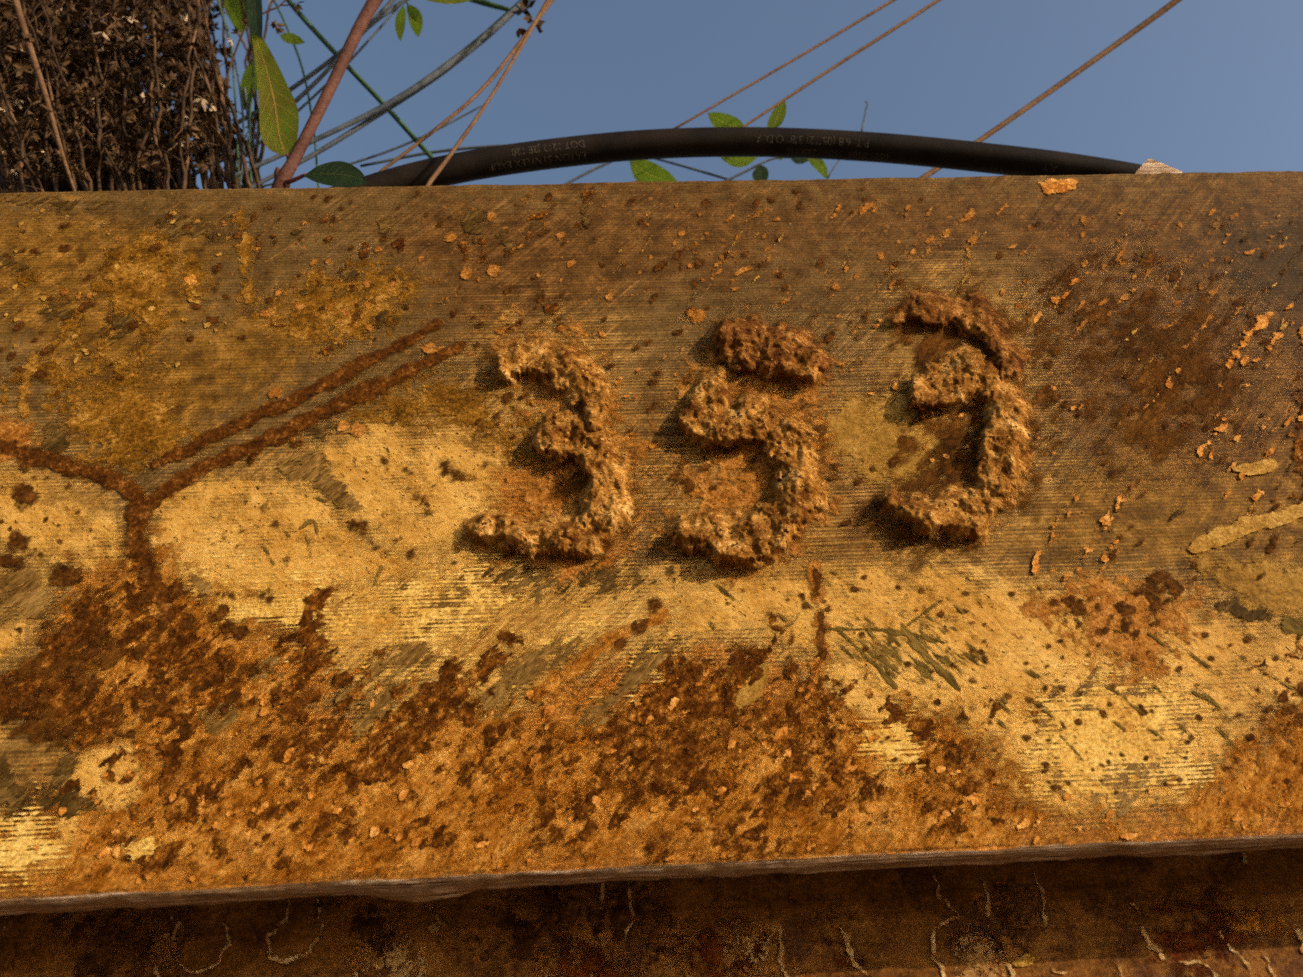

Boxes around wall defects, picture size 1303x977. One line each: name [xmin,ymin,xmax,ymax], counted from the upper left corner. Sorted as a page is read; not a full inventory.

rust [831,186,879,219]
rust [1038,178,1079,195]
rust [0,196,1303,894]